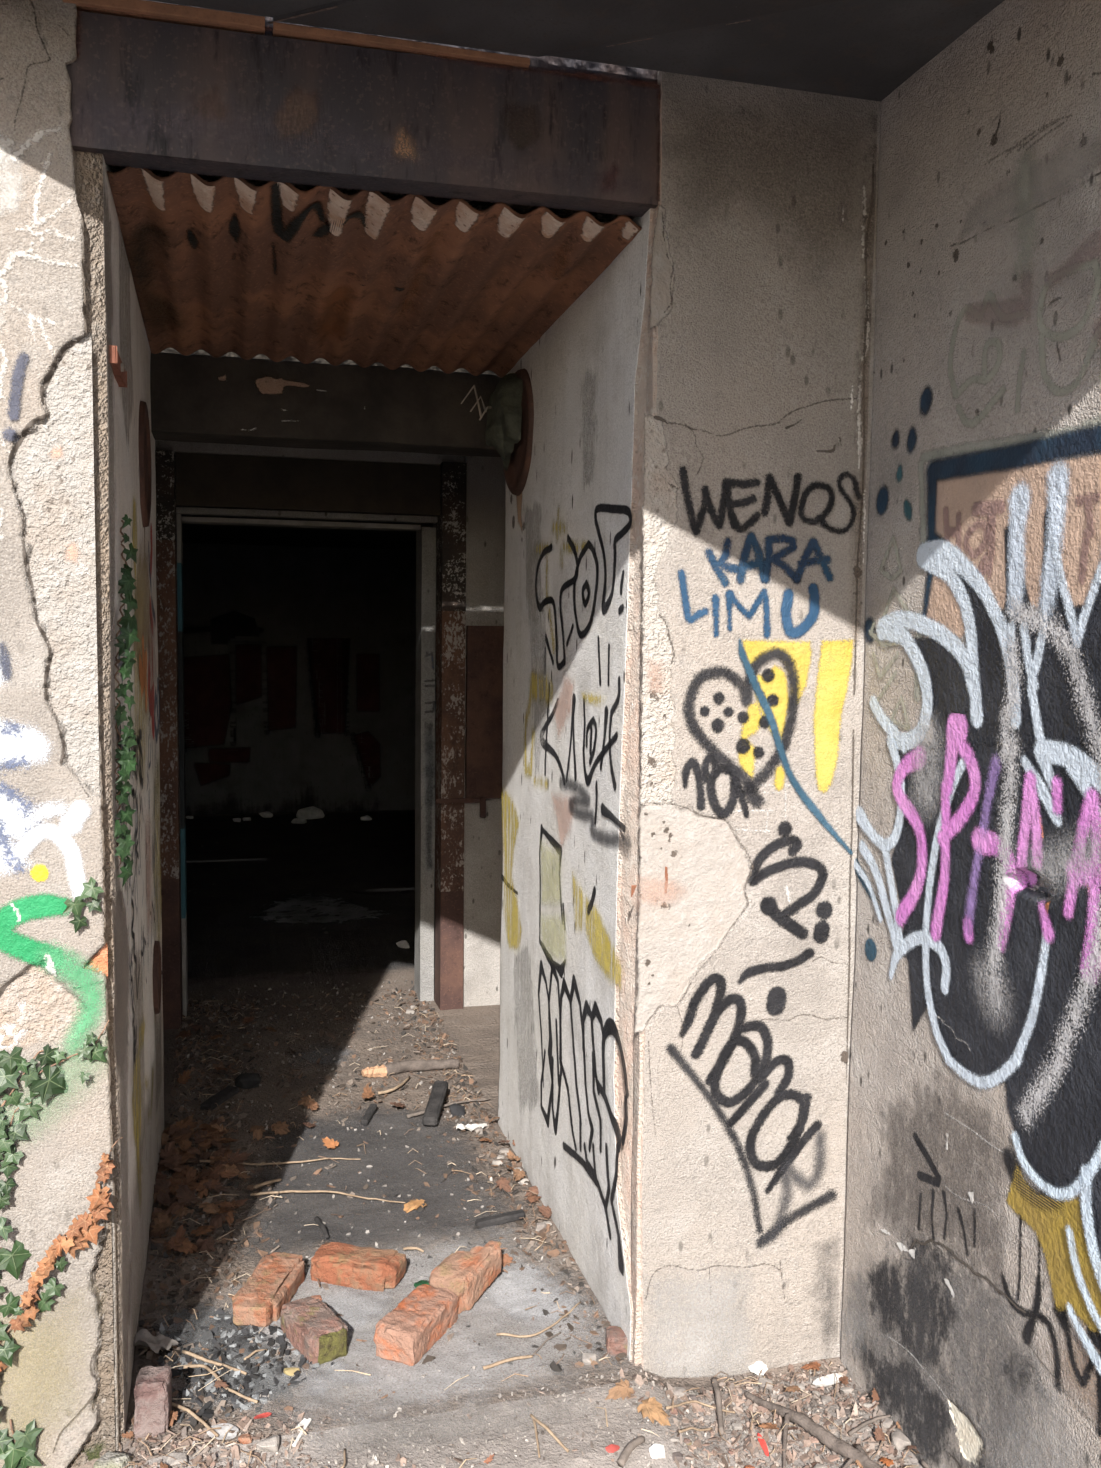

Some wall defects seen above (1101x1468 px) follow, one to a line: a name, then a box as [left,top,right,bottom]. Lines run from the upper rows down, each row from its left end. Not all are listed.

crack [667,398,868,474]
flaking render [82,943,108,976]
flaking render [0,964,87,1051]